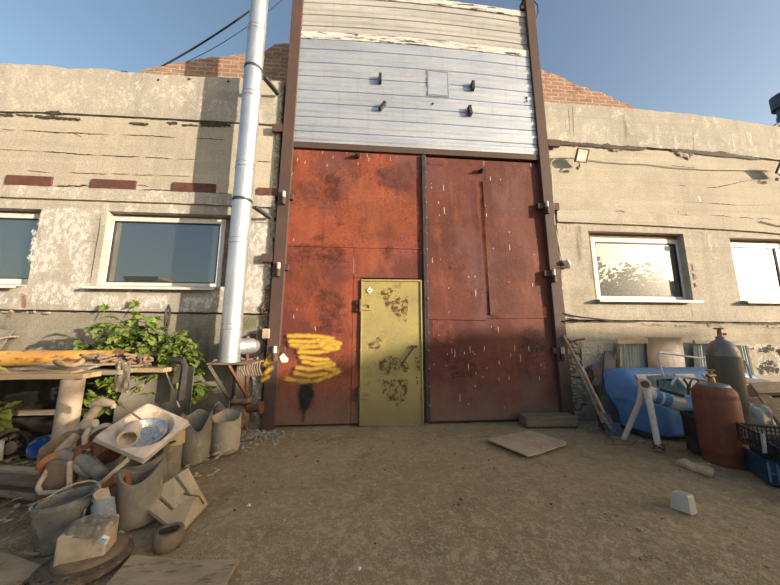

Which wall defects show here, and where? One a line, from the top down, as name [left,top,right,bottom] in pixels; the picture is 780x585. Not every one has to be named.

crack [0,129,196,191]
crack [678,179,771,230]
peeling [26,189,92,315]
peeling [90,295,120,307]
peeling [136,295,168,309]
peeling [183,296,214,309]
corrosion [378,287,408,322]
corrosion [379,355,420,406]
water stain [757,360,780,375]